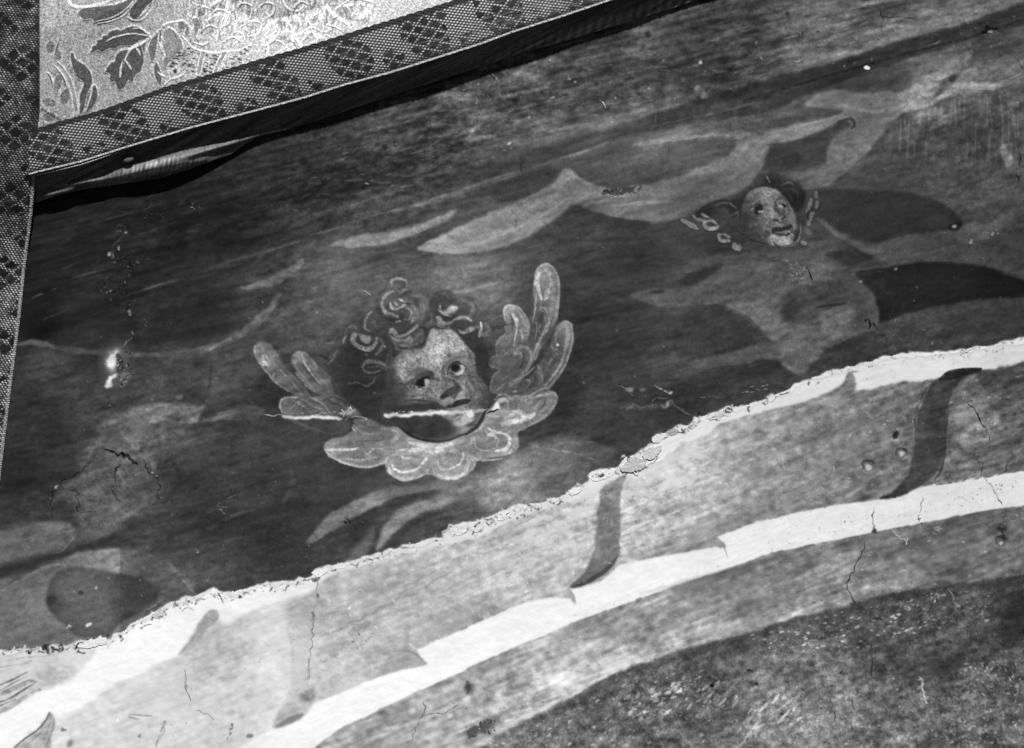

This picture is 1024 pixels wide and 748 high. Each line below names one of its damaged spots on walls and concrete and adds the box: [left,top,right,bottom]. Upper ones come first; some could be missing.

crack [49,449,161,516]
spalling [0,337,1024,656]
crack [960,393,1007,503]
crack [847,512,876,603]